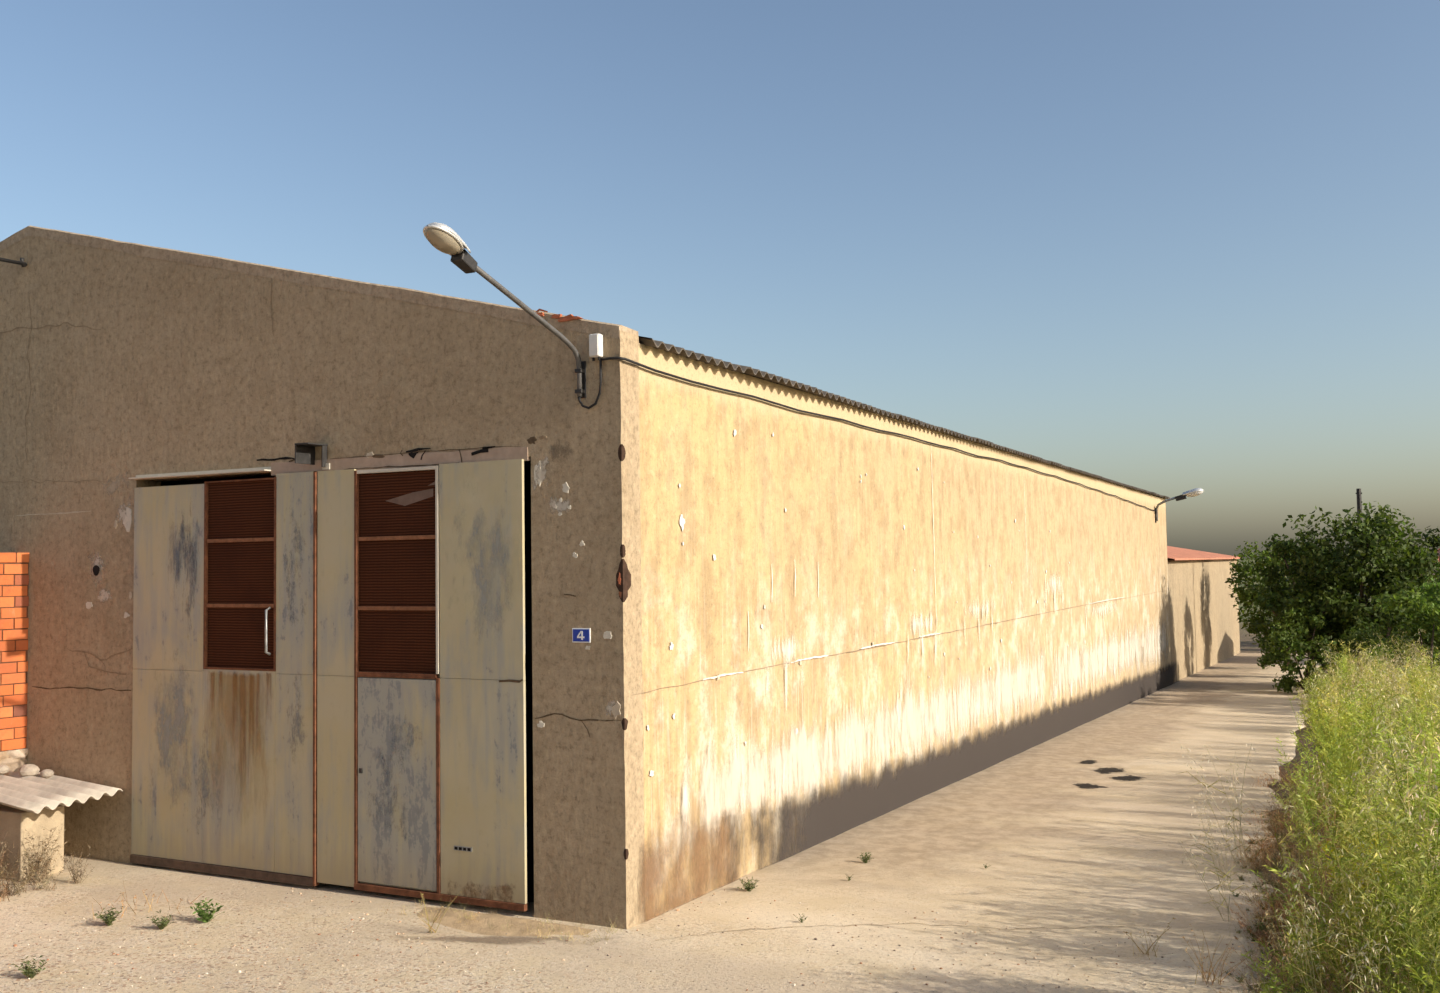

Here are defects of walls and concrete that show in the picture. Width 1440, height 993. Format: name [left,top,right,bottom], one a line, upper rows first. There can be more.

crack [0,299,105,484]
leakage [682,625,1179,869]